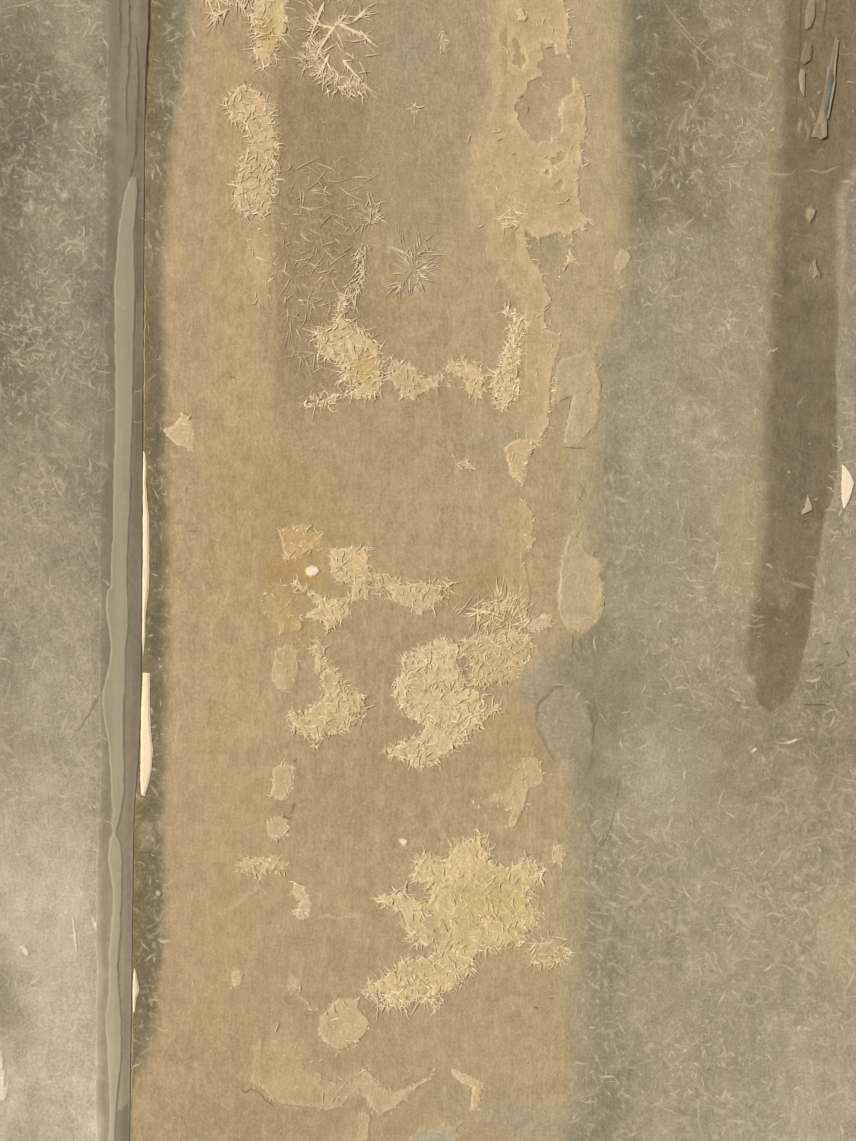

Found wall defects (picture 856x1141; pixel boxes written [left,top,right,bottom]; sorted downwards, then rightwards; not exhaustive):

peeling [91,0,645,1141]
water stain [710,0,856,714]